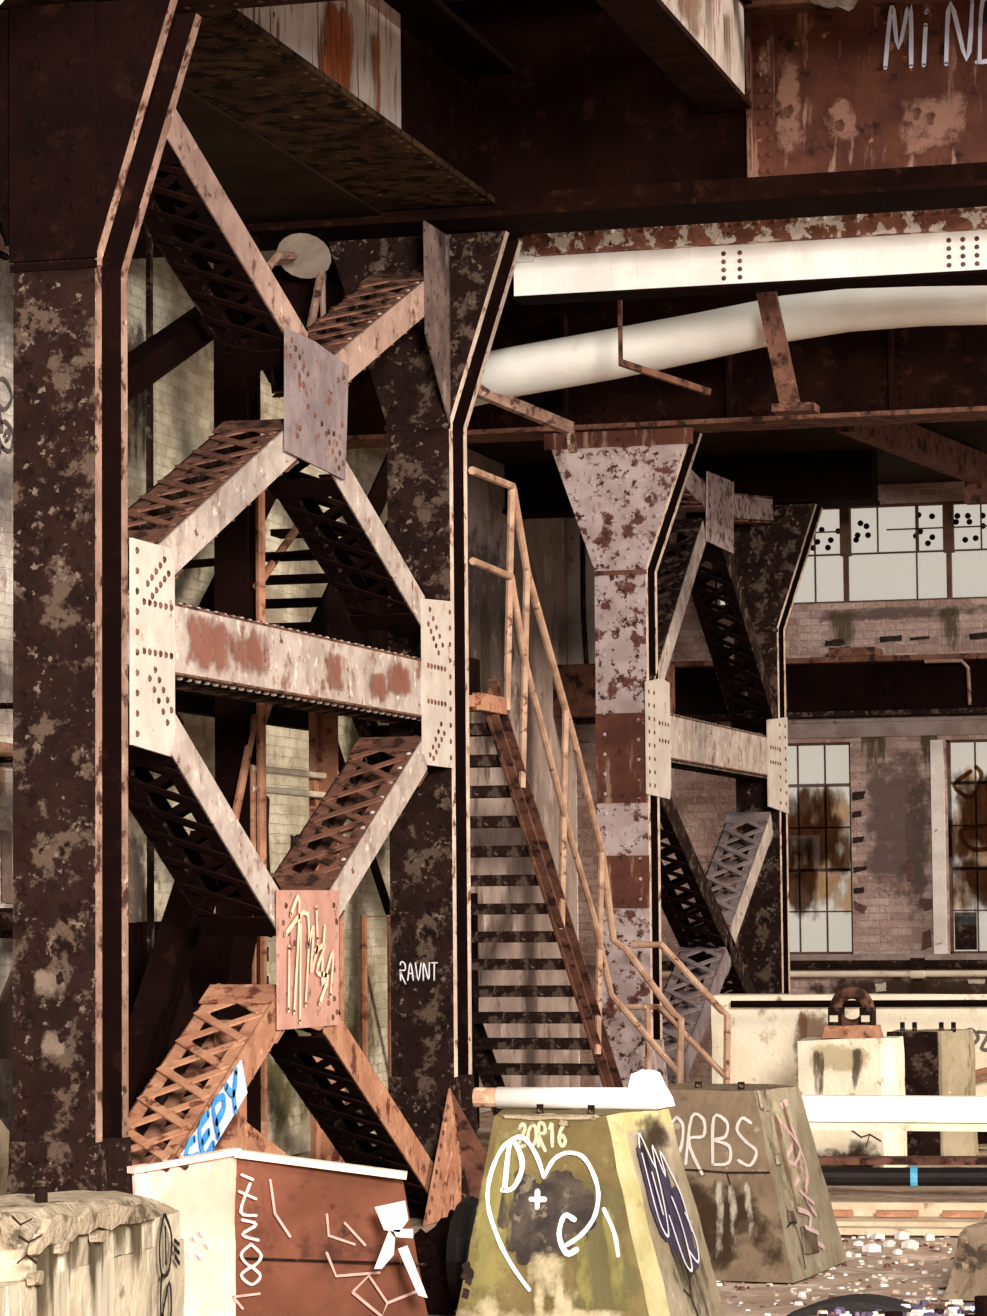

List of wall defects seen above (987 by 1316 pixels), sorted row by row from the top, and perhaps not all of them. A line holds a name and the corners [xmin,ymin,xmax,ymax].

rust [321,1,353,91]
rust [187,615,270,674]
rust [326,652,346,690]
rust [370,660,411,702]